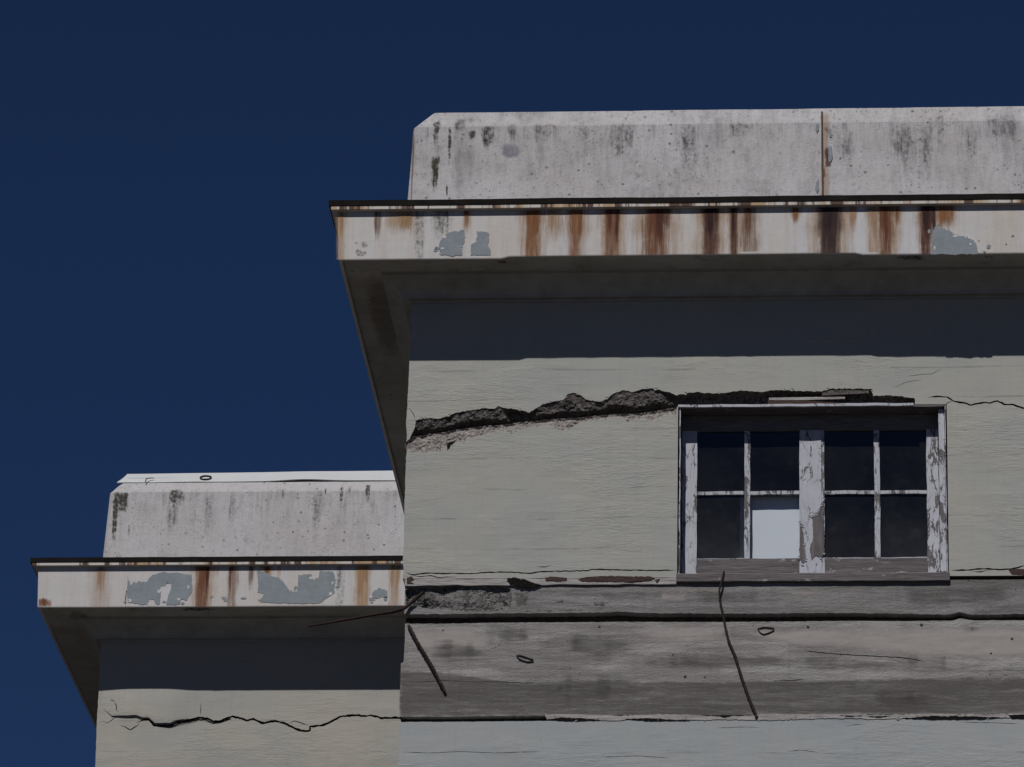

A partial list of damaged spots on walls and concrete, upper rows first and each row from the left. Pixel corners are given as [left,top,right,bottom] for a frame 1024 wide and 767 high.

leakage [432,120,494,194]
corrosion [700,208,756,254]
corrosion [813,207,856,253]
corrosion [918,206,955,254]
peeling [928,224,991,255]
crack [894,370,1024,409]
spalling [405,387,915,453]
leakage [112,492,129,538]
peeling [798,498,825,565]
corrosion [196,567,210,606]
spalling [308,576,659,692]
crack [102,700,400,732]